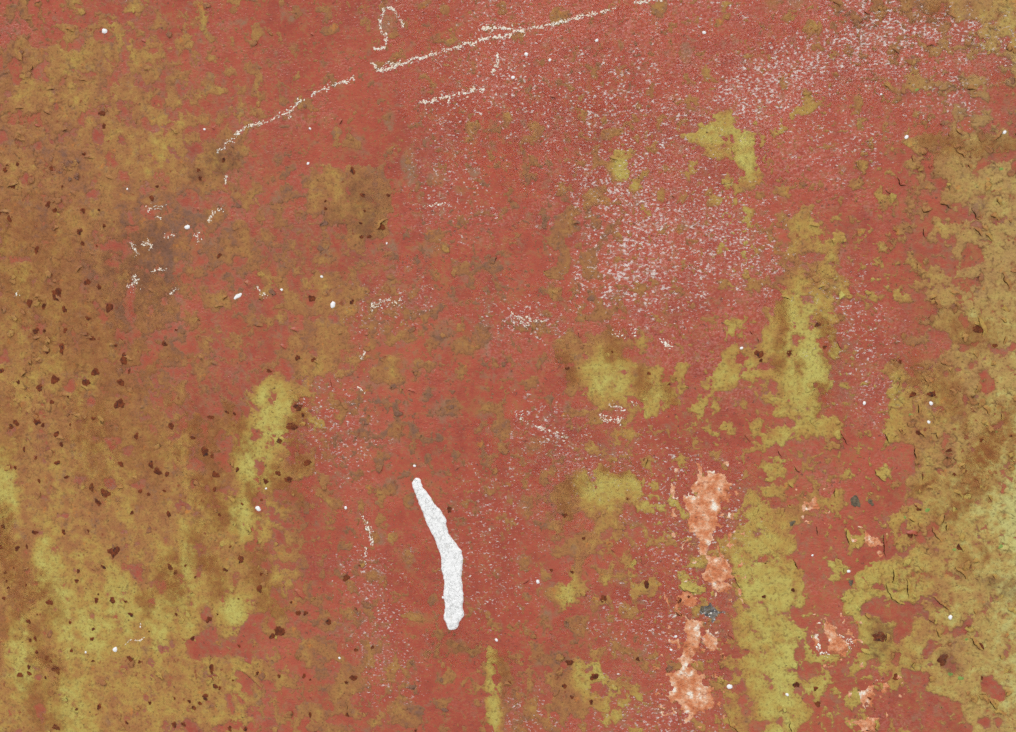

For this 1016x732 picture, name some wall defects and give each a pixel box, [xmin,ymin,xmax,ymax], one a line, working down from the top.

peeling [0,0,512,732]
peeling [443,0,675,285]